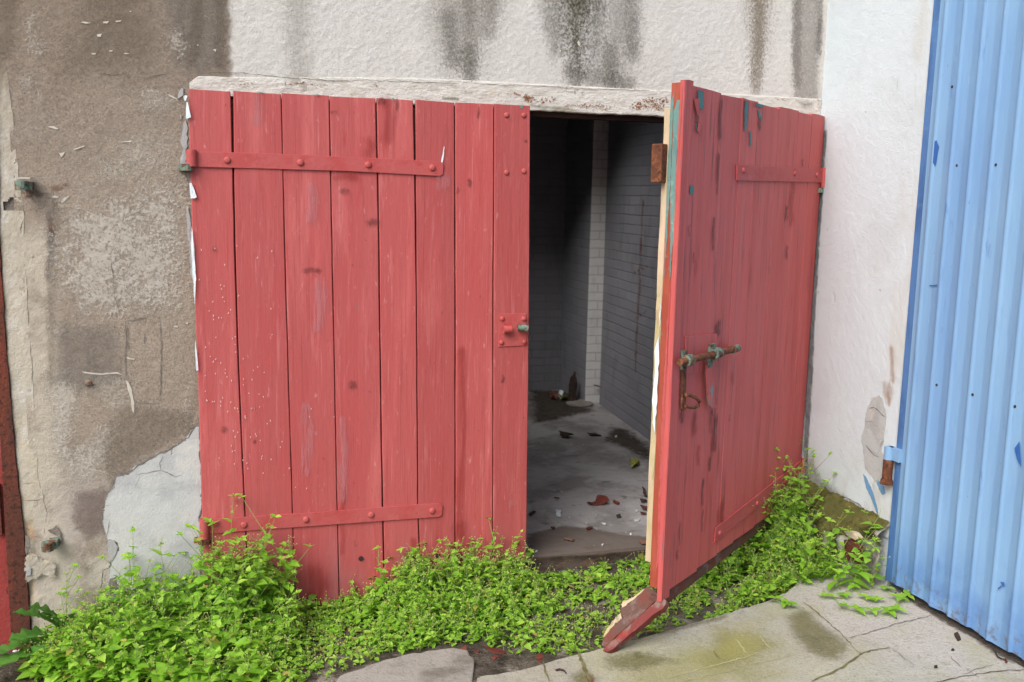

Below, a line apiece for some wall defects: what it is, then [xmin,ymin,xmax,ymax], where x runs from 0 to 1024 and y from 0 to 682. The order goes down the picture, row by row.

corrosion [507,91,612,110]
corrosion [629,96,668,111]
spalling [861,395,886,490]
crack [805,603,923,682]
crack [937,656,1024,682]